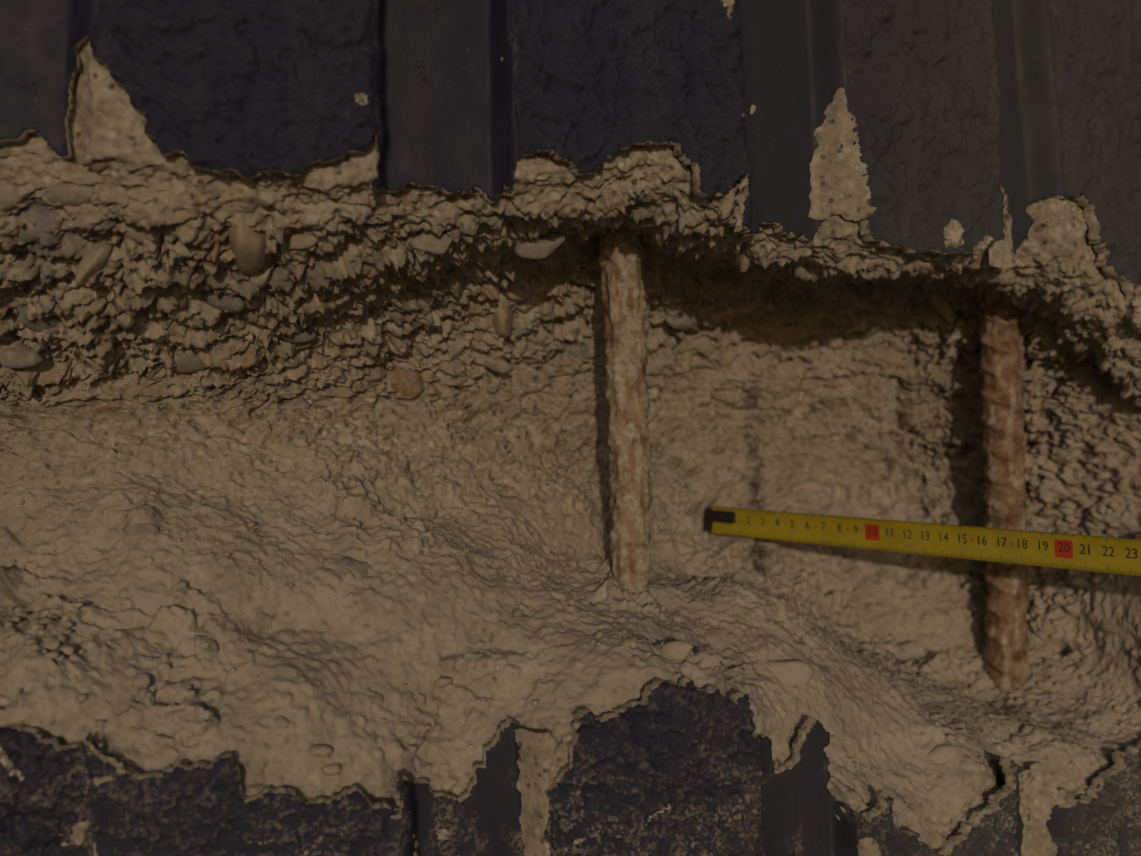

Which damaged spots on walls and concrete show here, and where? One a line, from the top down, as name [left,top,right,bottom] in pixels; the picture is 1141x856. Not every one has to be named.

peeling [68,40,165,176]
spalling [226,217,266,275]
peeling [347,137,378,204]
peeling [504,152,568,209]
peeling [607,145,686,192]
peeling [801,88,876,252]
peeling [1012,197,1098,273]
spalling [598,222,653,592]
spalling [978,292,1028,531]
spalling [983,561,1030,692]
peeling [514,729,556,856]
peeling [1018,763,1059,856]